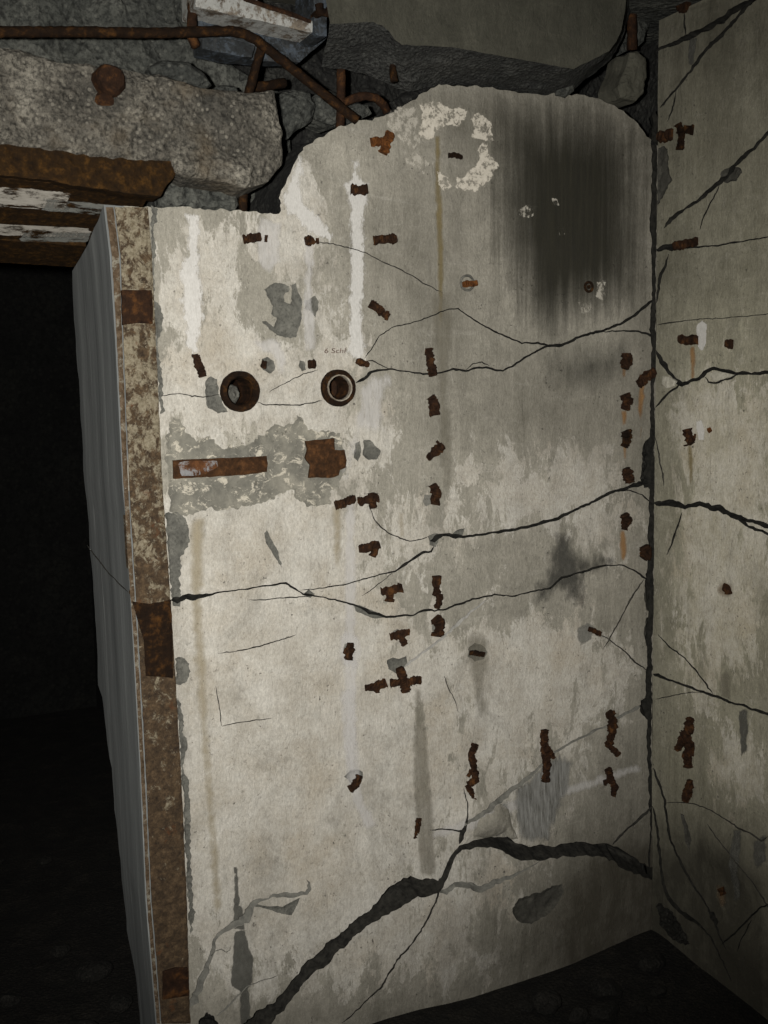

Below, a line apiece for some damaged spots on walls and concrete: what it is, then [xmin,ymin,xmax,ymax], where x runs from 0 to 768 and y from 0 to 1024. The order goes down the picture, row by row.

peeling [387,101,499,192]
peeling [579,281,606,312]
spalling [150,205,381,607]
crack [171,0,768,1024]
spalling [354,605,384,618]
spalling [175,657,191,685]
spalling [177,698,196,933]
spalling [512,884,564,924]